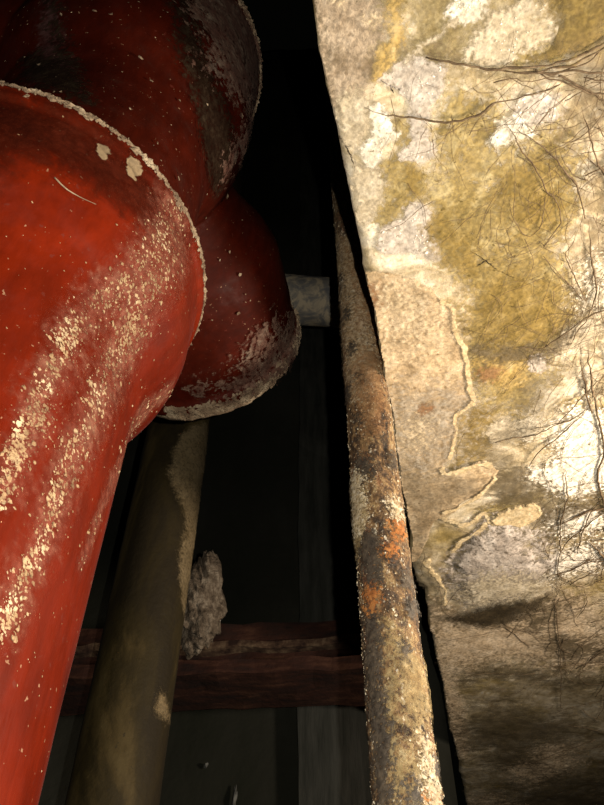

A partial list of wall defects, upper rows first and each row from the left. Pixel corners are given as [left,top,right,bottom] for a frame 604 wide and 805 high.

damp [335,0,568,225]
rust [368,284,383,309]
damp [376,202,441,261]
damp [471,245,604,390]
peeling [365,265,566,630]
rust [361,582,386,618]
rust [380,516,408,563]
damp [428,388,604,805]